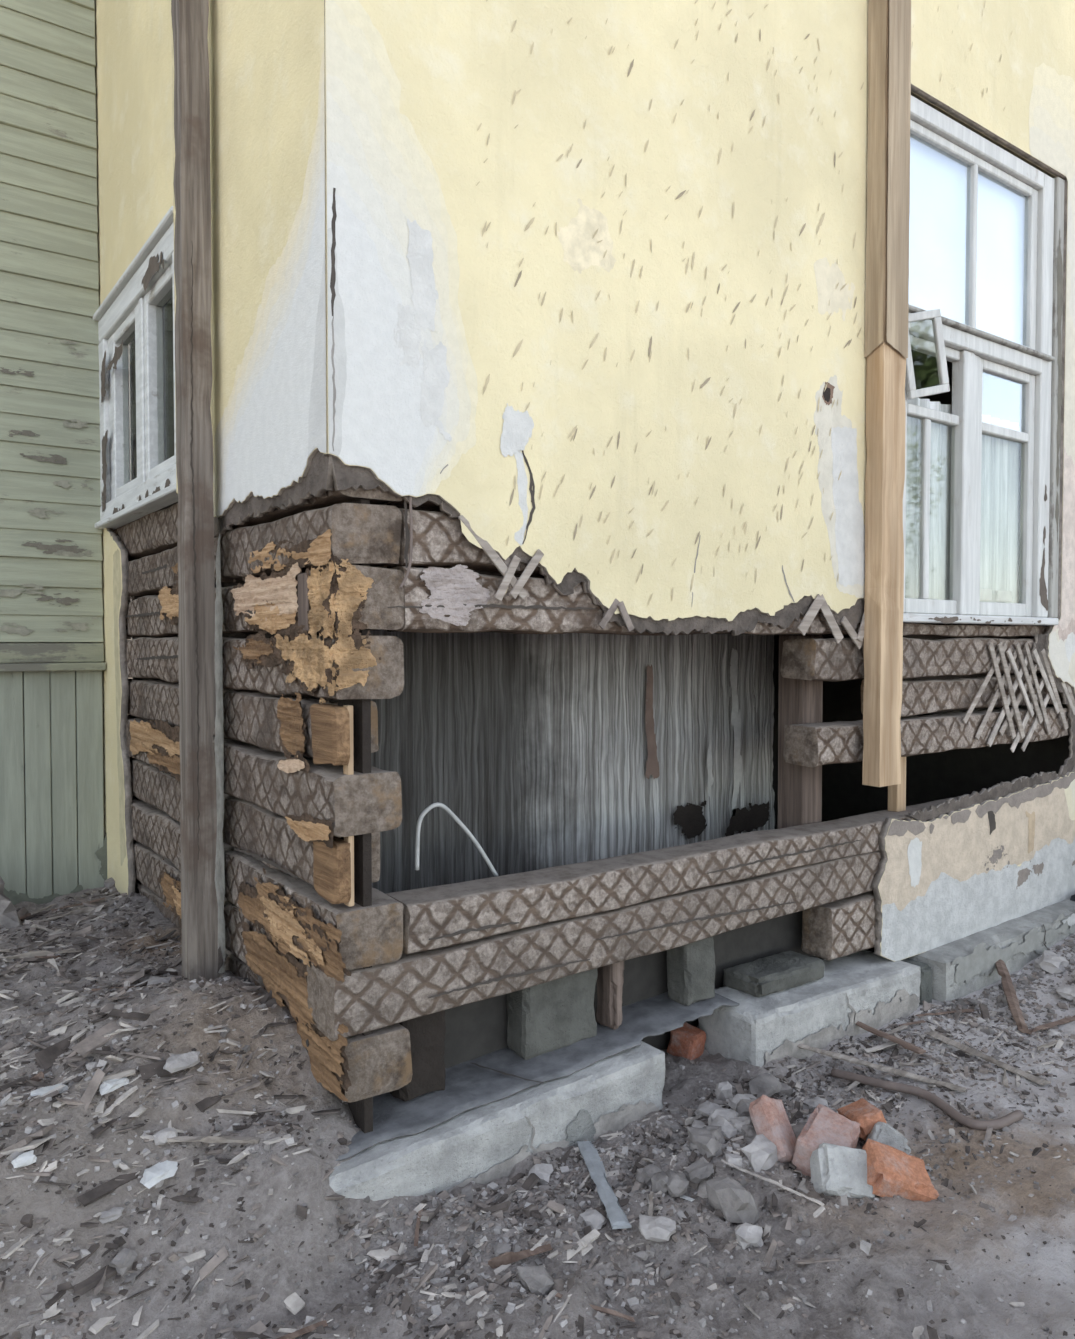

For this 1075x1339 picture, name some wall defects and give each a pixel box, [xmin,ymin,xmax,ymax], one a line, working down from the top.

peeling [142,251,164,291]
crack [329,188,337,451]
peeling [0,367,35,376]
peeling [101,339,123,403]
peeling [20,452,67,464]
peeling [63,418,170,514]
spalling [500,404,865,636]
spalling [419,564,491,626]
spalling [673,800,707,839]
spalling [725,801,770,836]